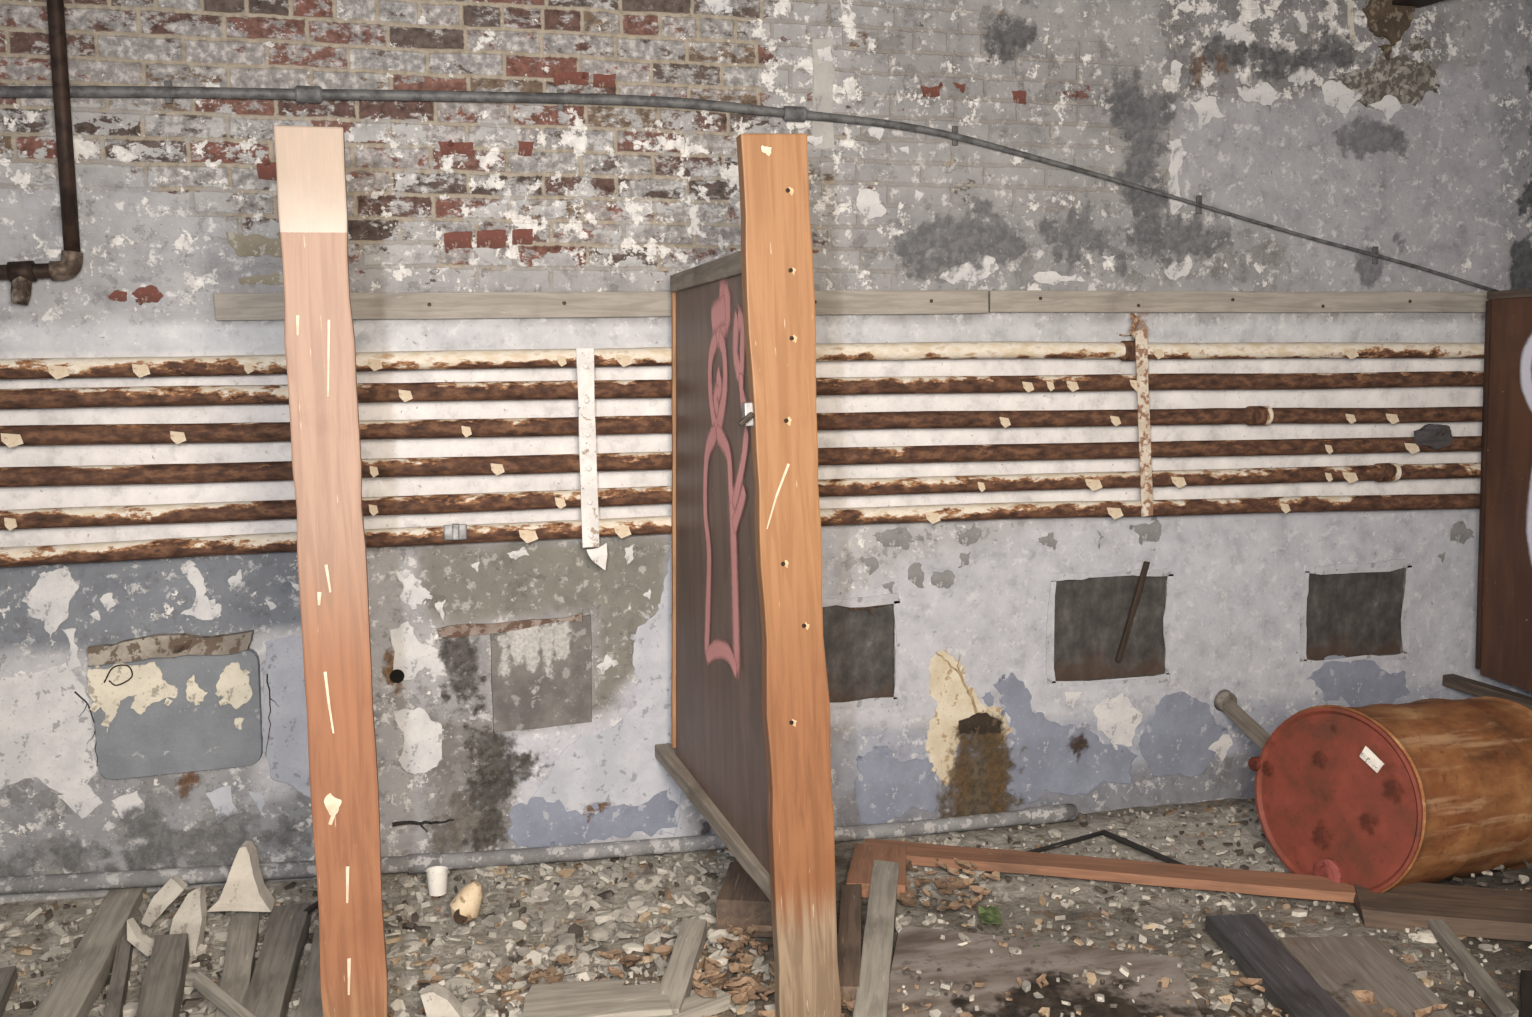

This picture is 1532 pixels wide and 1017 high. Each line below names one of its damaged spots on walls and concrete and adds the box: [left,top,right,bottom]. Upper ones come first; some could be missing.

leakage [984,14,1037,64]
leakage [1194,31,1369,88]
flaking render [1236,0,1440,123]
leakage [1039,73,1229,276]
spalling [108,285,163,305]
spalling [443,229,533,253]
leakage [894,202,1027,278]
peeling [939,255,999,285]
leakage [1510,181,1532,290]
peeling [0,560,311,820]
leakage [432,621,571,853]
peeling [925,650,1012,786]